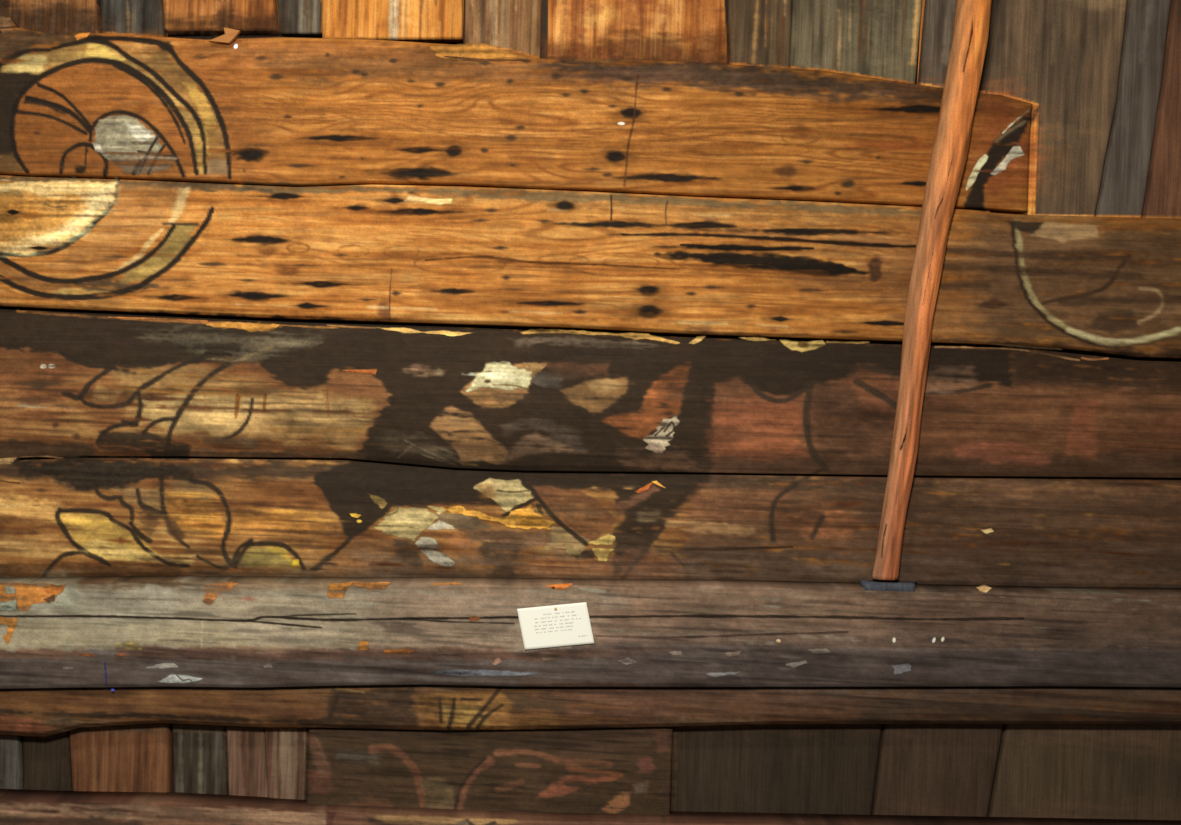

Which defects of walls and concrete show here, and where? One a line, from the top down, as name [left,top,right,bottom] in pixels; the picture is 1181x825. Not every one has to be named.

spalling [966,146,1024,190]
peeling [466,362,547,392]
peeling [644,417,679,453]
peeling [350,478,555,567]
peeling [565,534,616,561]
peeling [0,582,65,644]
crack [0,613,519,628]
crack [589,615,1024,638]